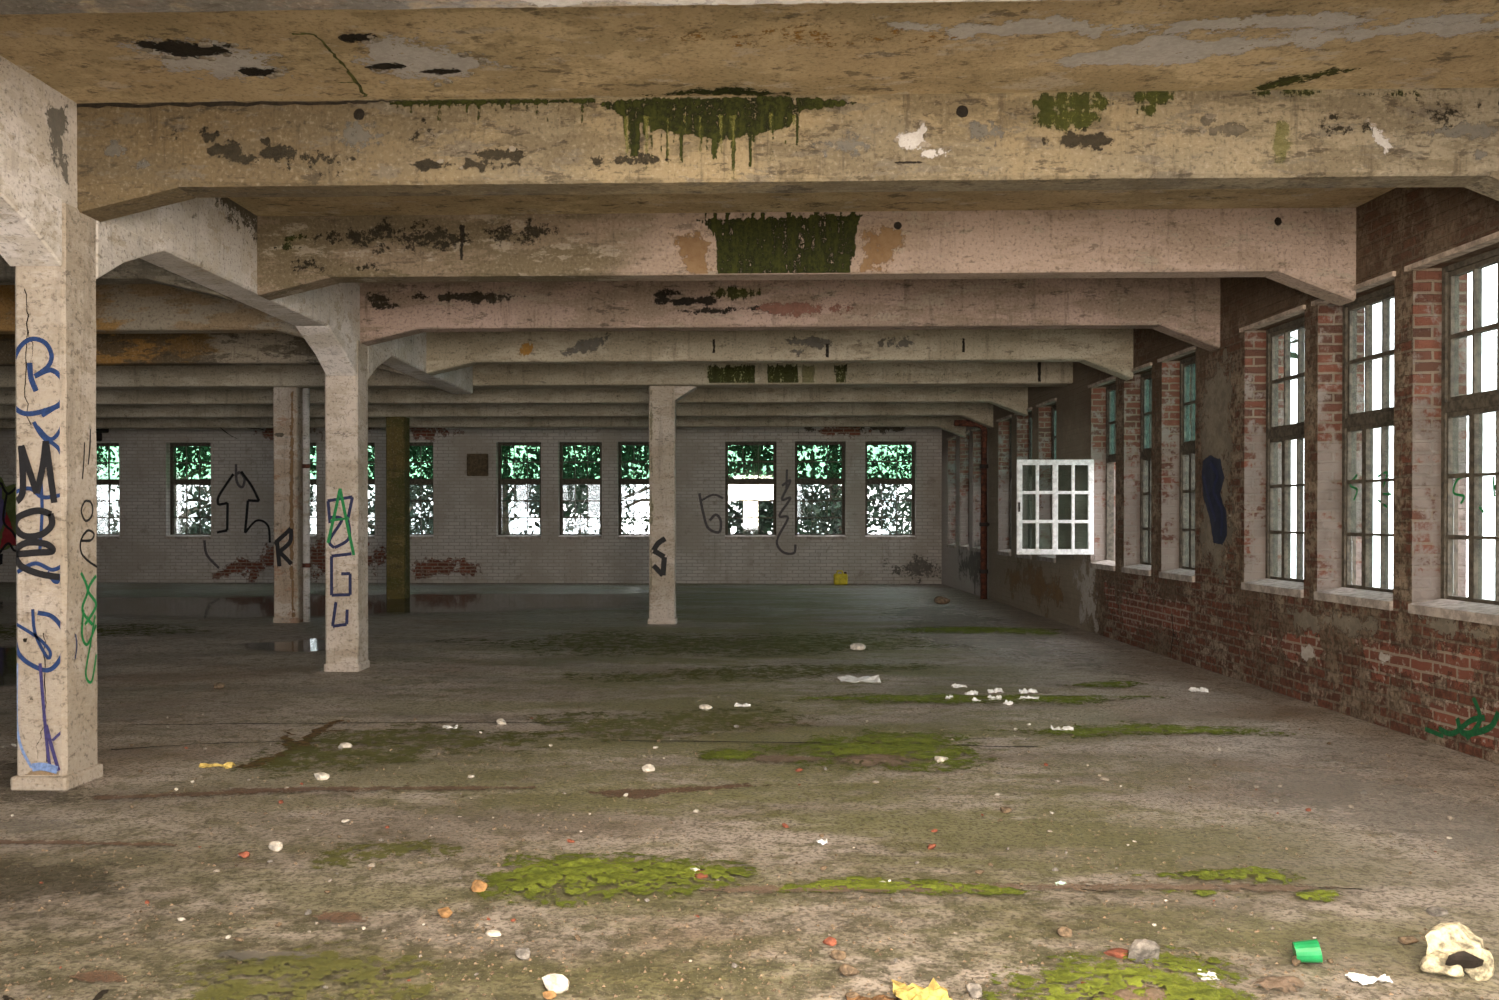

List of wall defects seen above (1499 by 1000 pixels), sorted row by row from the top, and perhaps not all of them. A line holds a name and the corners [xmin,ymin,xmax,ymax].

peeling [517,0,1499,68]
peeling [115,37,293,82]
water stain [573,153,671,167]
mould [1042,127,1113,151]
flaking render [205,543,274,583]
flaking render [310,534,325,582]
flaking render [368,543,386,576]
flaking render [411,557,482,580]
flaking render [1070,555,1190,650]
flaking render [1244,607,1499,753]